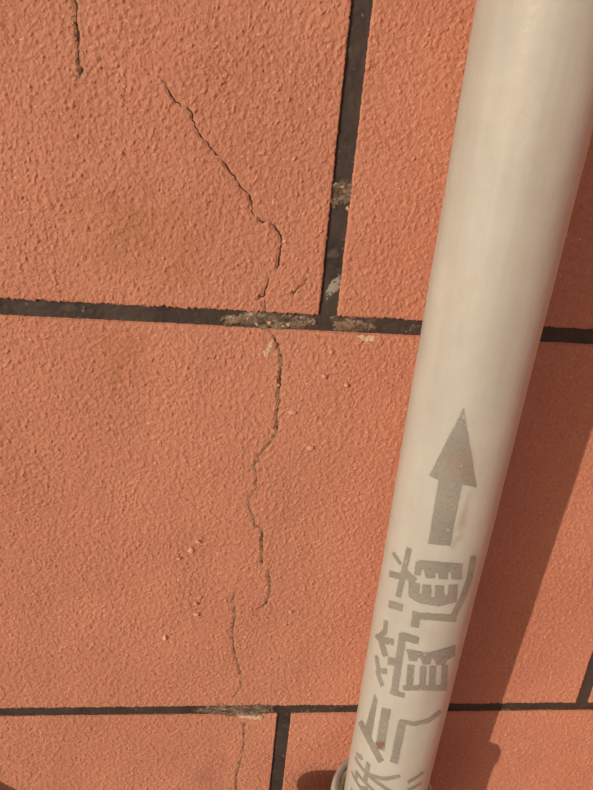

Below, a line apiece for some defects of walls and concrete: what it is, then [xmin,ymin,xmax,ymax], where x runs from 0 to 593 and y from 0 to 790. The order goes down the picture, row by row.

crack [71,0,88,80]
crack [162,80,284,610]
crack [230,588,244,698]
crack [235,722,247,790]